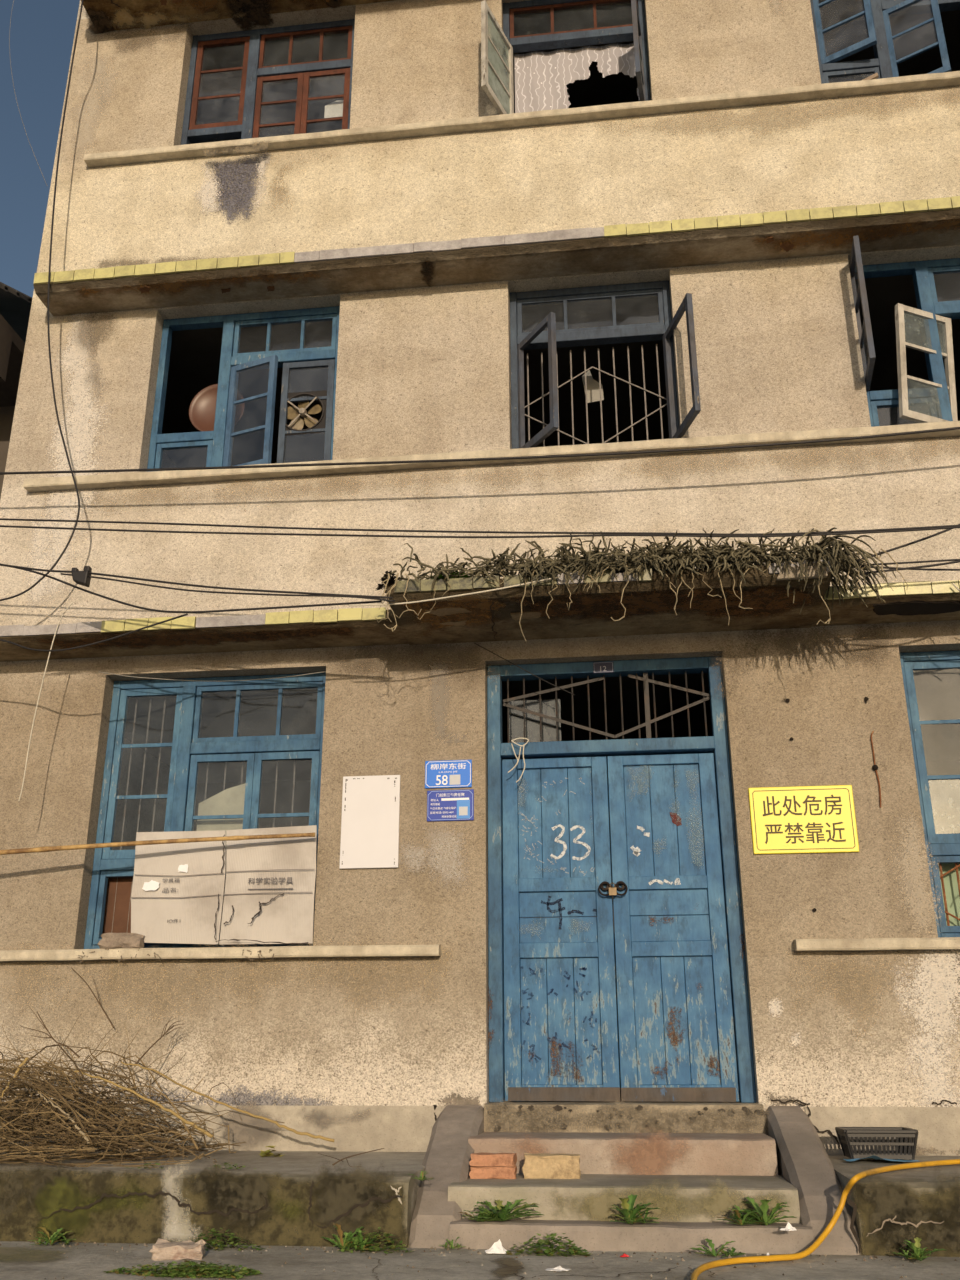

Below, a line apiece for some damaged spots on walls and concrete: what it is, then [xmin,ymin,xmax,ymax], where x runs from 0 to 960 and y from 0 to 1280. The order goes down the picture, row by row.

leakage [86,0,273,34]
leakage [195,142,270,224]
leakage [890,815,940,933]
leakage [893,949,960,1107]
leakage [132,1171,191,1259]
crack [847,1190,944,1253]
crack [515,1266,725,1280]